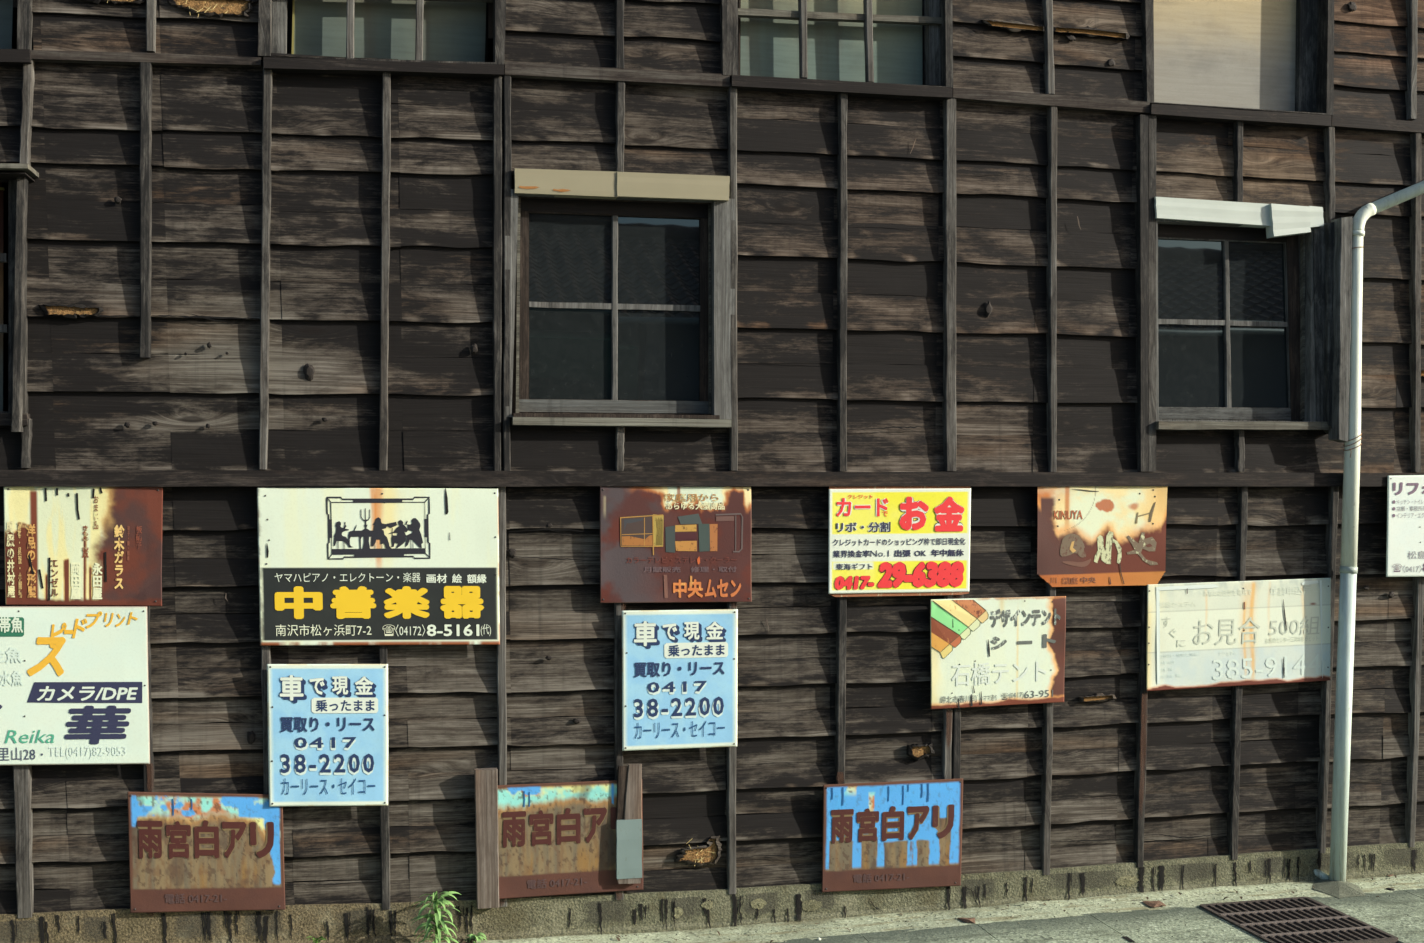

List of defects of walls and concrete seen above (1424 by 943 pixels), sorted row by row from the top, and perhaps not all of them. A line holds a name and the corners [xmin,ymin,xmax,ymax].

damp [39,915,80,943]
damp [101,914,117,943]
damp [201,910,293,943]
damp [323,906,396,941]
damp [456,905,473,935]
damp [632,899,675,930]
damp [732,894,802,927]
damp [946,884,986,910]
damp [1005,877,1033,902]
damp [1068,872,1085,900]
damp [1138,865,1184,893]
damp [1213,851,1322,886]